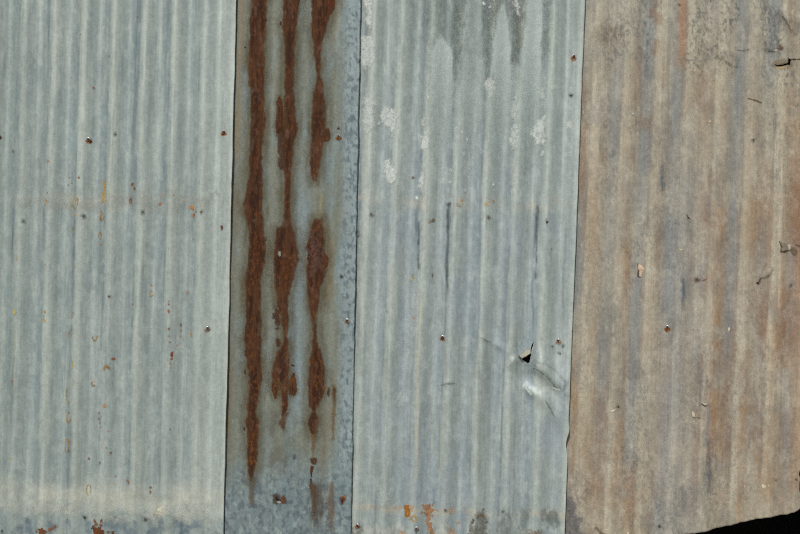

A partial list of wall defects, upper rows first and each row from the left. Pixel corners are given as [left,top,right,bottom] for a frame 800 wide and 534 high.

leakage [427,0,546,156]
leakage [421,118,431,152]
corrosion [241,0,346,527]
corrosion [91,519,114,534]
corrosion [404,504,434,534]